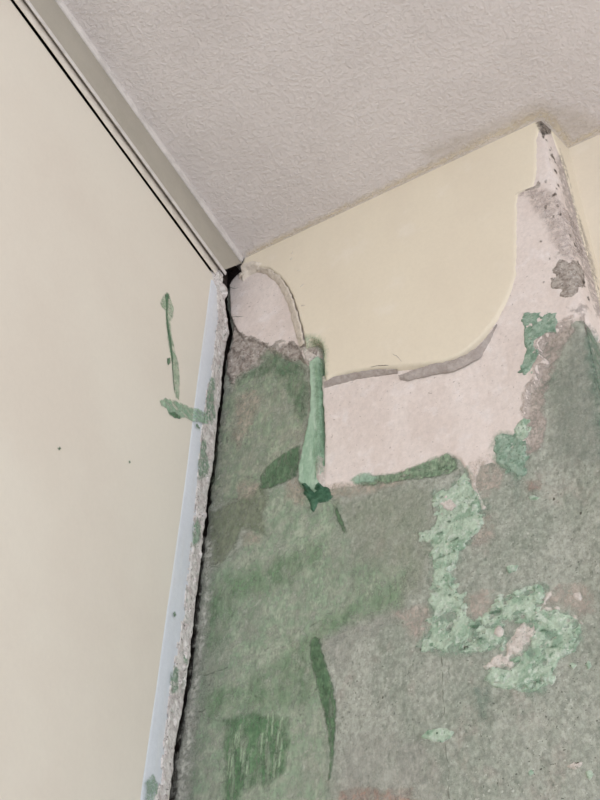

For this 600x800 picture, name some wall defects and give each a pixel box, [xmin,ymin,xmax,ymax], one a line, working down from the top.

flaking render [226,127,600,693]
water stain [520,315,574,453]
crack [169,266,243,800]
water stain [226,712,284,779]
peeling [421,728,454,743]